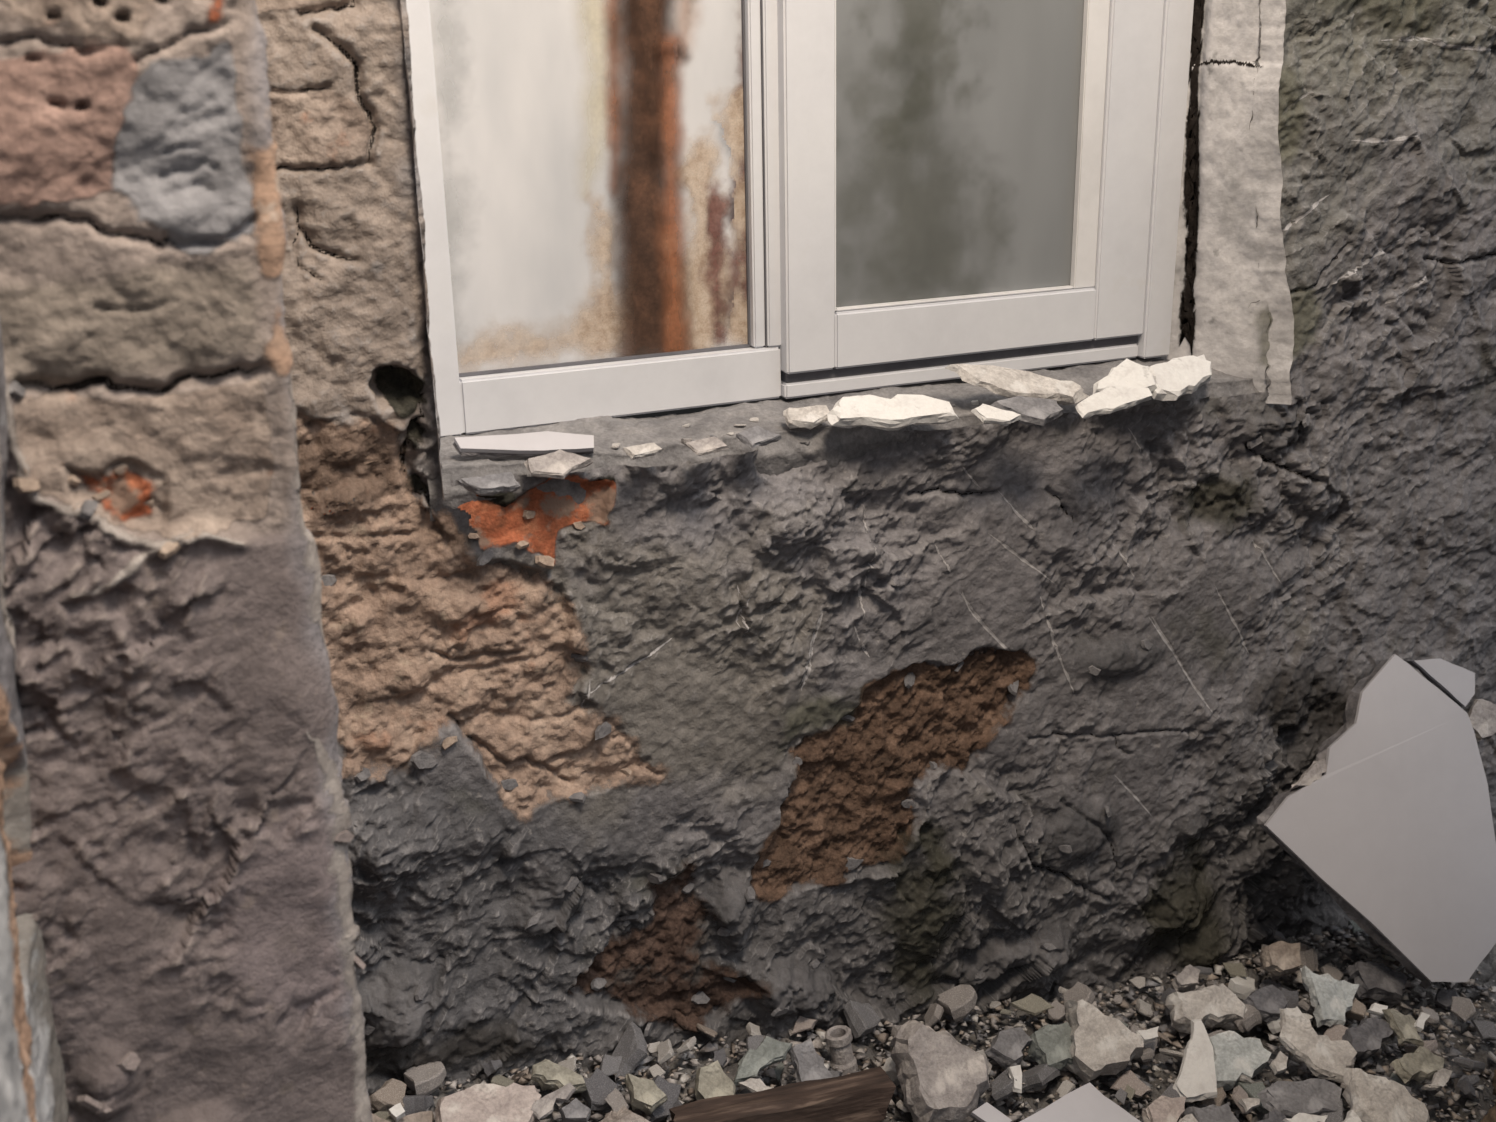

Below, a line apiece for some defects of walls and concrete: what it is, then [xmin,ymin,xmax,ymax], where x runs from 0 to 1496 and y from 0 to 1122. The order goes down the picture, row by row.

flaking render [0,0,160,208]
leakage [446,186,458,236]
rust [462,0,751,364]
crack [1180,0,1262,355]
peeling [0,514,17,677]
peeling [0,687,37,1122]
flaking render [0,379,274,597]
spalling [265,313,667,1122]
spalling [567,863,772,1037]
spalling [750,647,1036,902]
spalling [1257,654,1496,982]
spalling [1366,1003,1430,1047]